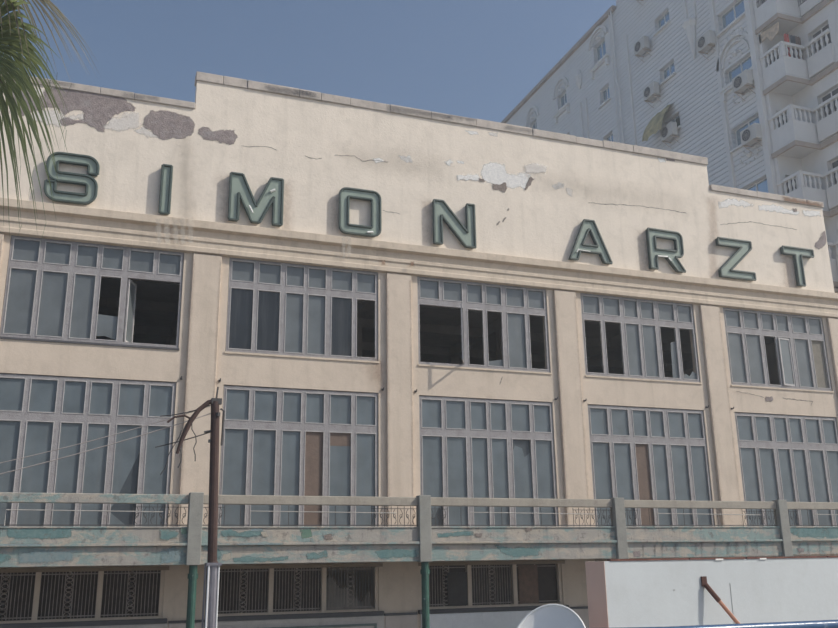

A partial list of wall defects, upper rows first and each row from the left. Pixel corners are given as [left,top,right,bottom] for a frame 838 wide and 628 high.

spalling [9,88,237,145]
peeling [457,162,547,193]
peeling [0,528,72,563]
peeling [160,528,187,563]